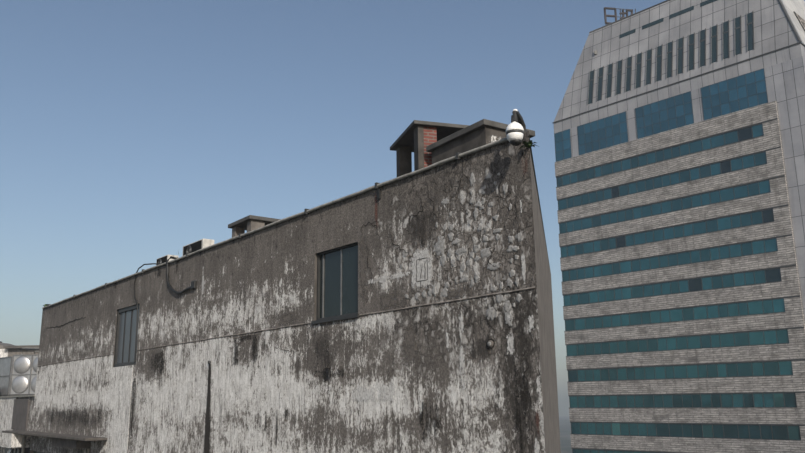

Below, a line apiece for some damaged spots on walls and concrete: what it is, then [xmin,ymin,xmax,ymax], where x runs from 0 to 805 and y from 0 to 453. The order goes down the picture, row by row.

crack [360,221,407,289]
peeling [359,172,526,354]
damp [149,351,165,374]
damp [233,334,258,367]
damp [315,338,344,381]
damp [51,406,101,428]
damp [127,379,136,453]
damp [420,402,440,441]